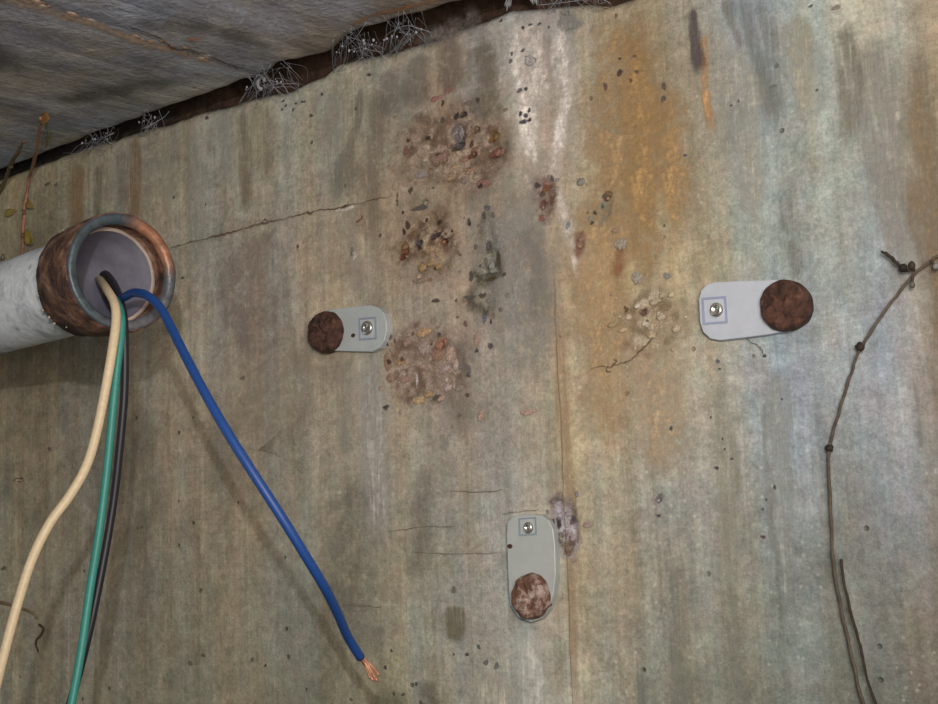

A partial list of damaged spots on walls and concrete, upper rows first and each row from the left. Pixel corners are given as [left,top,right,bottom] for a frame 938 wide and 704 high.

crack [174,192,398,247]
spalling [394,98,516,324]
spalling [379,323,471,414]
spalling [546,491,592,558]
water stain [518,638,551,704]